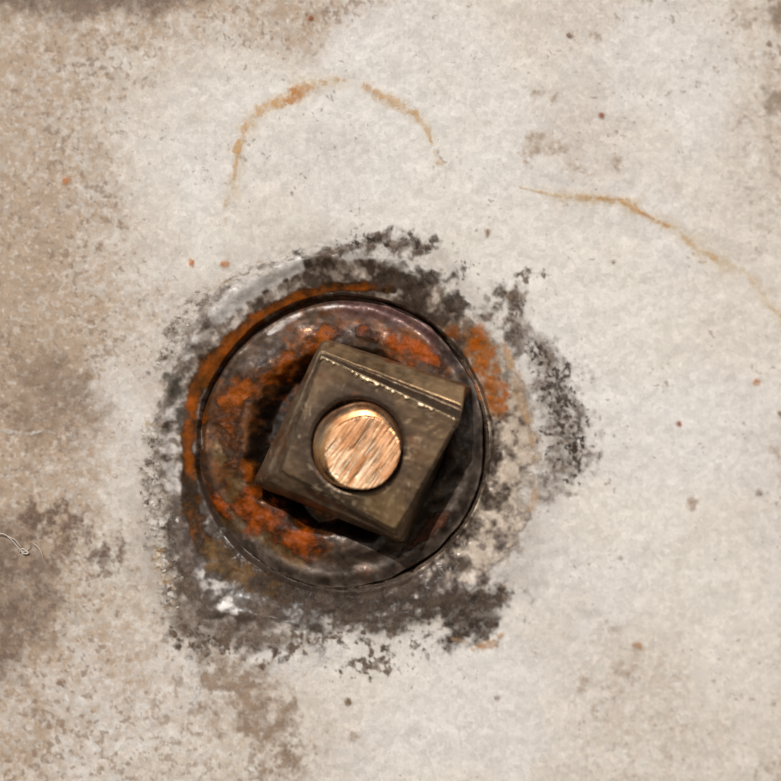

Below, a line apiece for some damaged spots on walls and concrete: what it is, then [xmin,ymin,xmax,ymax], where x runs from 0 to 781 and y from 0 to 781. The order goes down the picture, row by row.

corrosion [257,86,302,115]
corrosion [233,139,241,179]
damp [317,226,438,261]
damp [371,261,465,326]
damp [163,372,189,429]
corrosion [180,281,451,605]
corrosion [445,324,514,416]
damp [481,414,515,526]
damp [480,268,600,487]
damp [168,517,514,682]